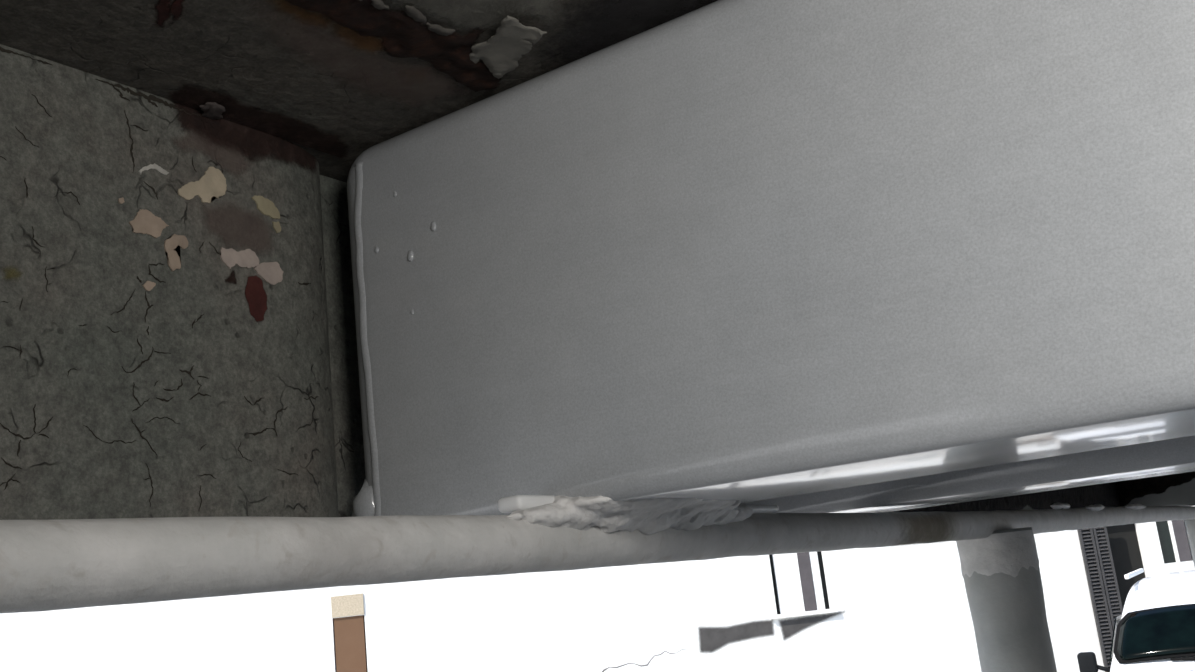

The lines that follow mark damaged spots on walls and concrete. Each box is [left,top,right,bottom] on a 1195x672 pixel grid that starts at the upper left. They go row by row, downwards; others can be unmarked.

crack [0,47,52,65]
spalling [285,0,558,92]
crack [0,127,39,197]
crack [0,227,55,309]
peeling [138,163,169,175]
peeling [129,209,188,271]
peeling [178,167,227,203]
peeling [220,247,283,285]
peeling [251,195,281,233]
crack [79,263,209,507]
crack [0,404,53,490]
crack [238,396,319,475]